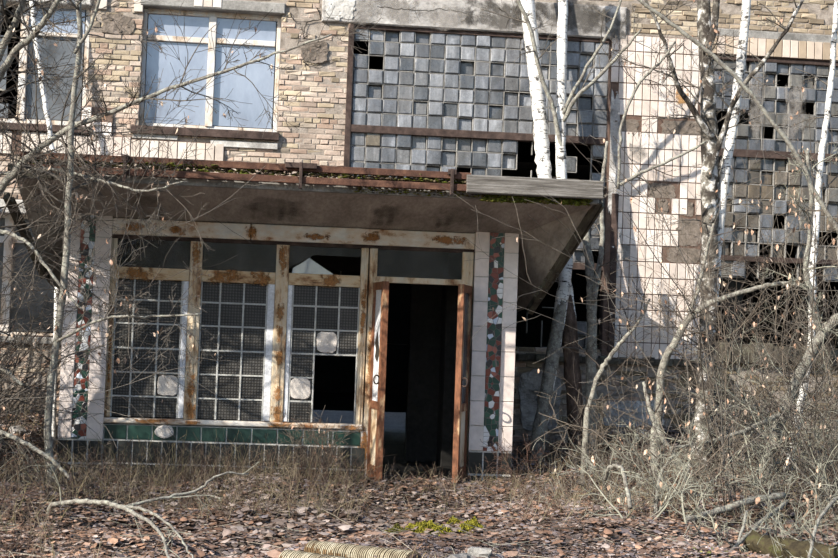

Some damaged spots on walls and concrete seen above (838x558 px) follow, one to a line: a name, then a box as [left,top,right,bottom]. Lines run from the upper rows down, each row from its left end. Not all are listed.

leakage [356,0,412,23]
leakage [431,0,522,30]
leakage [536,1,629,40]
spalling [660,120,701,139]
spalling [648,183,676,215]
rust [432,236,469,245]
spalling [666,202,701,263]
rust [274,304,284,366]
rust [186,373,200,425]
rust [269,386,289,427]